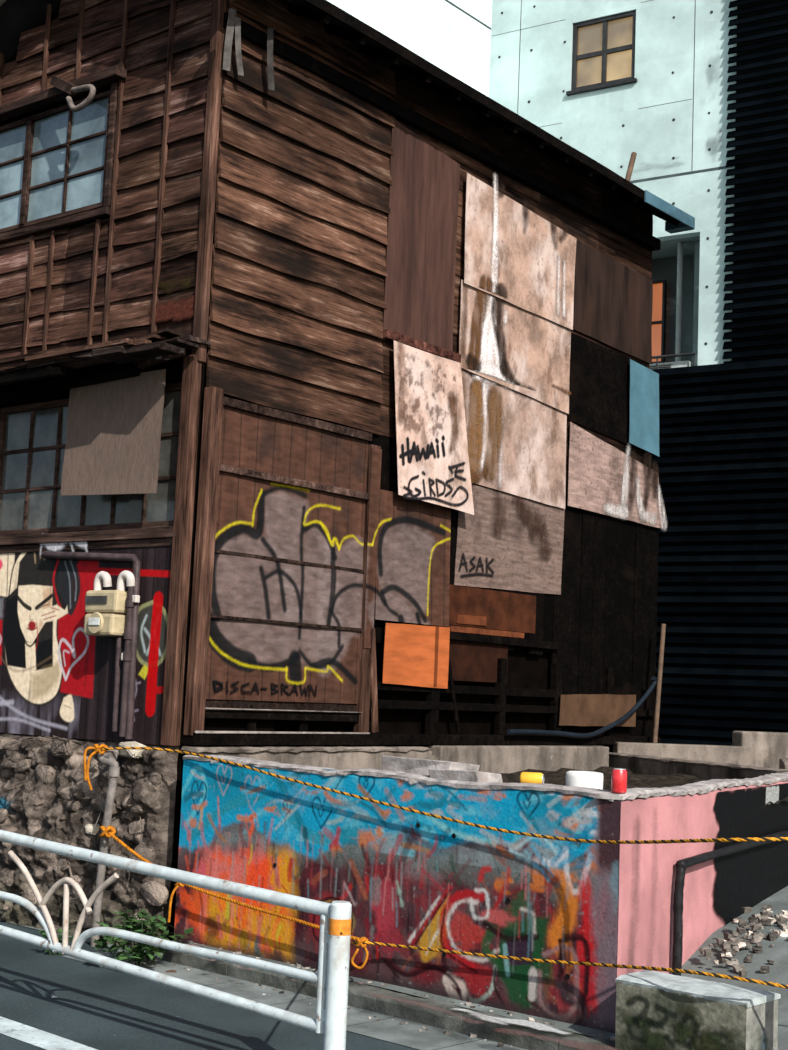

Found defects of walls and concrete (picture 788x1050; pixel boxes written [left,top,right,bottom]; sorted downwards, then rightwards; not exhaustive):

water stain [474,174,514,474]